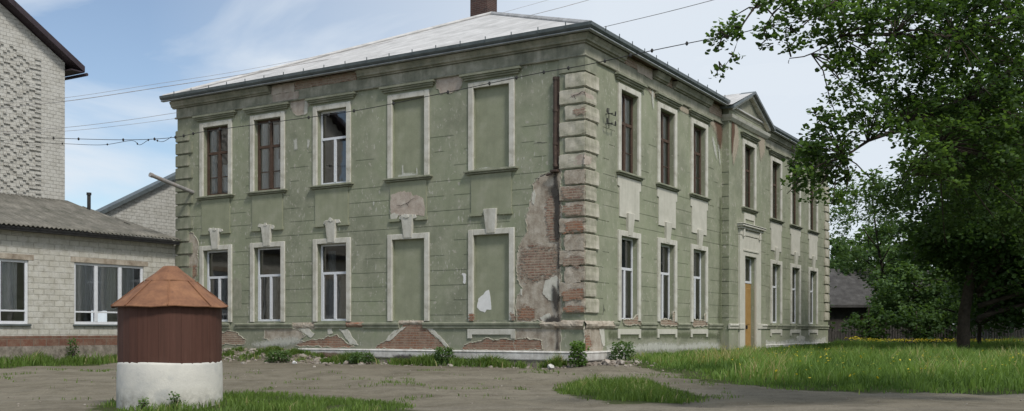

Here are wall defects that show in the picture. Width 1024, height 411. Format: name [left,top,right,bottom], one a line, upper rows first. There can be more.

spalling [264,328,358,349]
spalling [375,153,592,351]